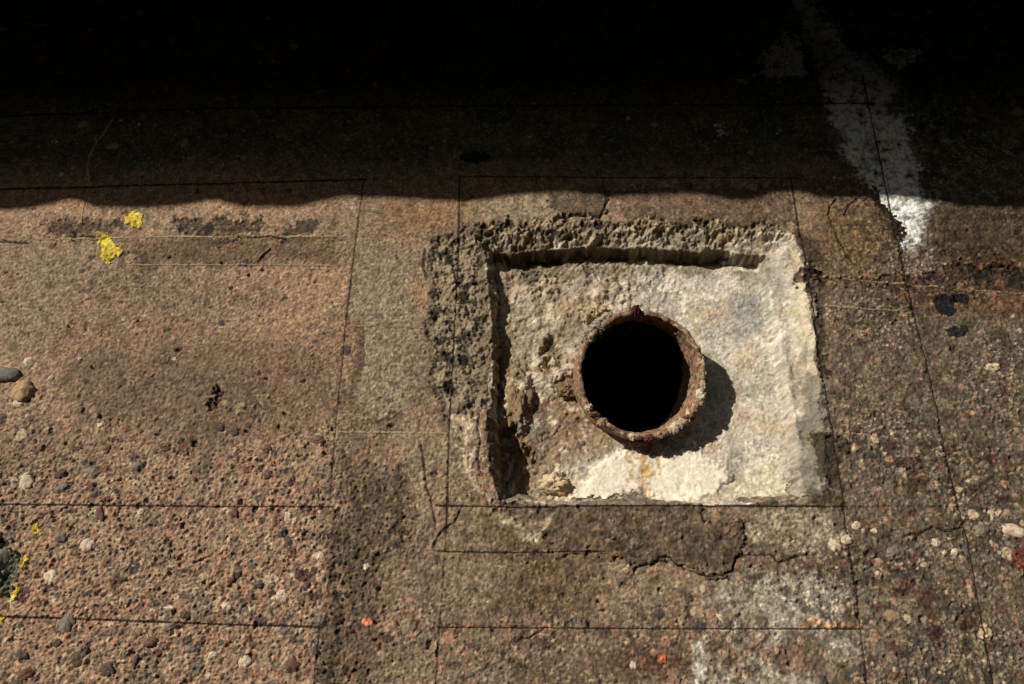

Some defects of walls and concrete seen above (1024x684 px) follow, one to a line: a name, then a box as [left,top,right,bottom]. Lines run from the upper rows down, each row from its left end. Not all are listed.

corrosion [584,403,609,428]
peeling [423,178,798,580]
corrosion [628,397,705,492]
crack [632,553,809,577]